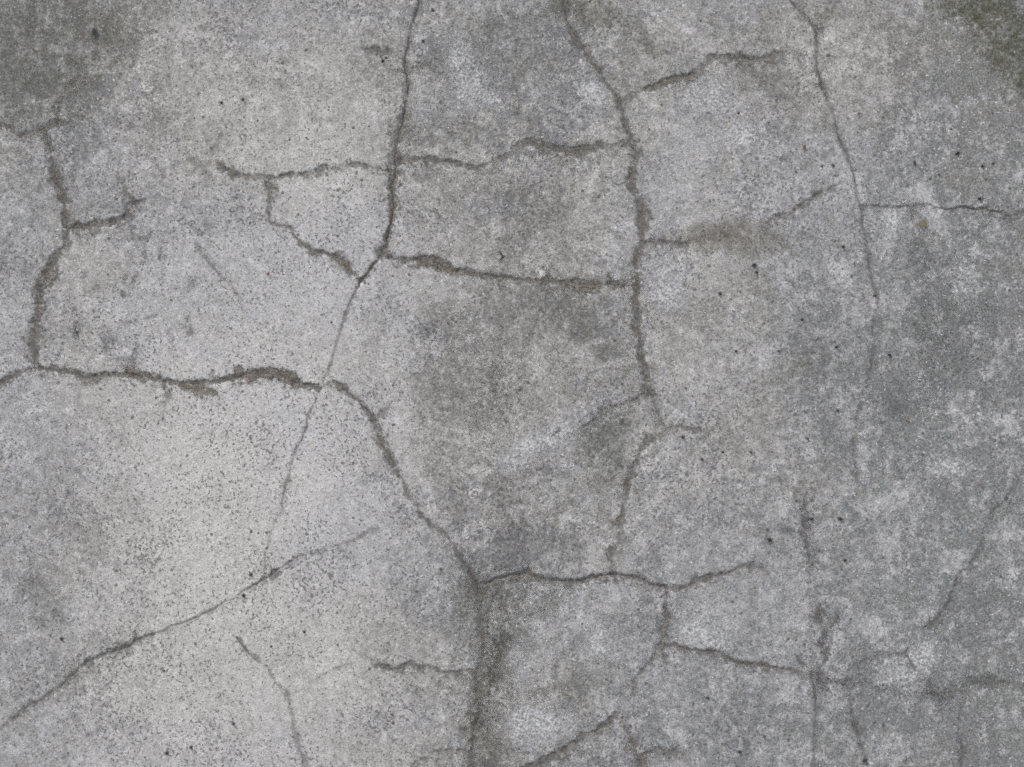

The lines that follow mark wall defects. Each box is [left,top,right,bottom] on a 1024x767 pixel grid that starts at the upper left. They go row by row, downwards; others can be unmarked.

crack [835,124,889,208]
crack [932,205,1006,216]
crack [0,0,832,714]
crack [529,714,658,767]